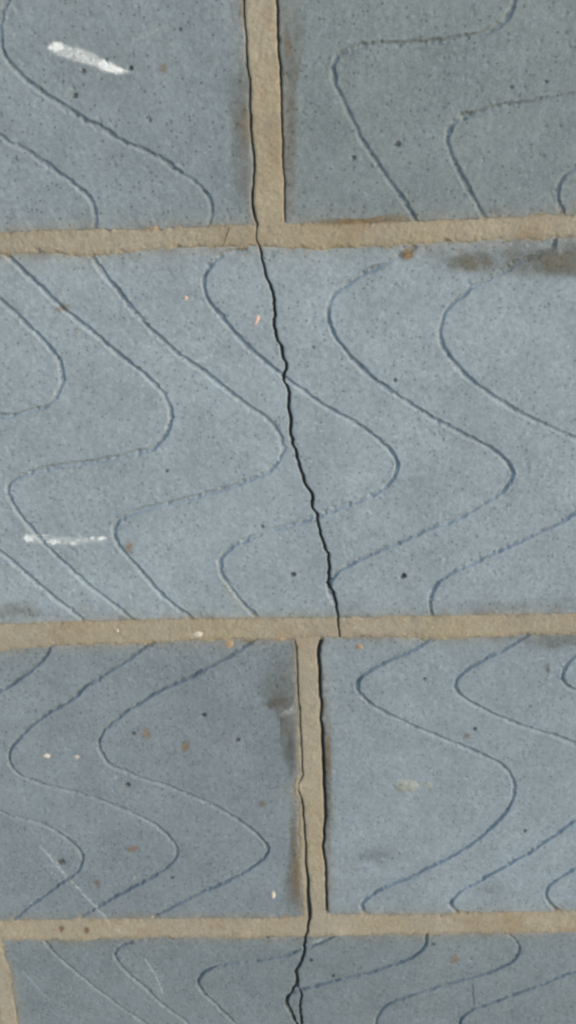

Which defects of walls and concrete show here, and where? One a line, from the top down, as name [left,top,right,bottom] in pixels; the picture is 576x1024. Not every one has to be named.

crack [243,0,340,1024]